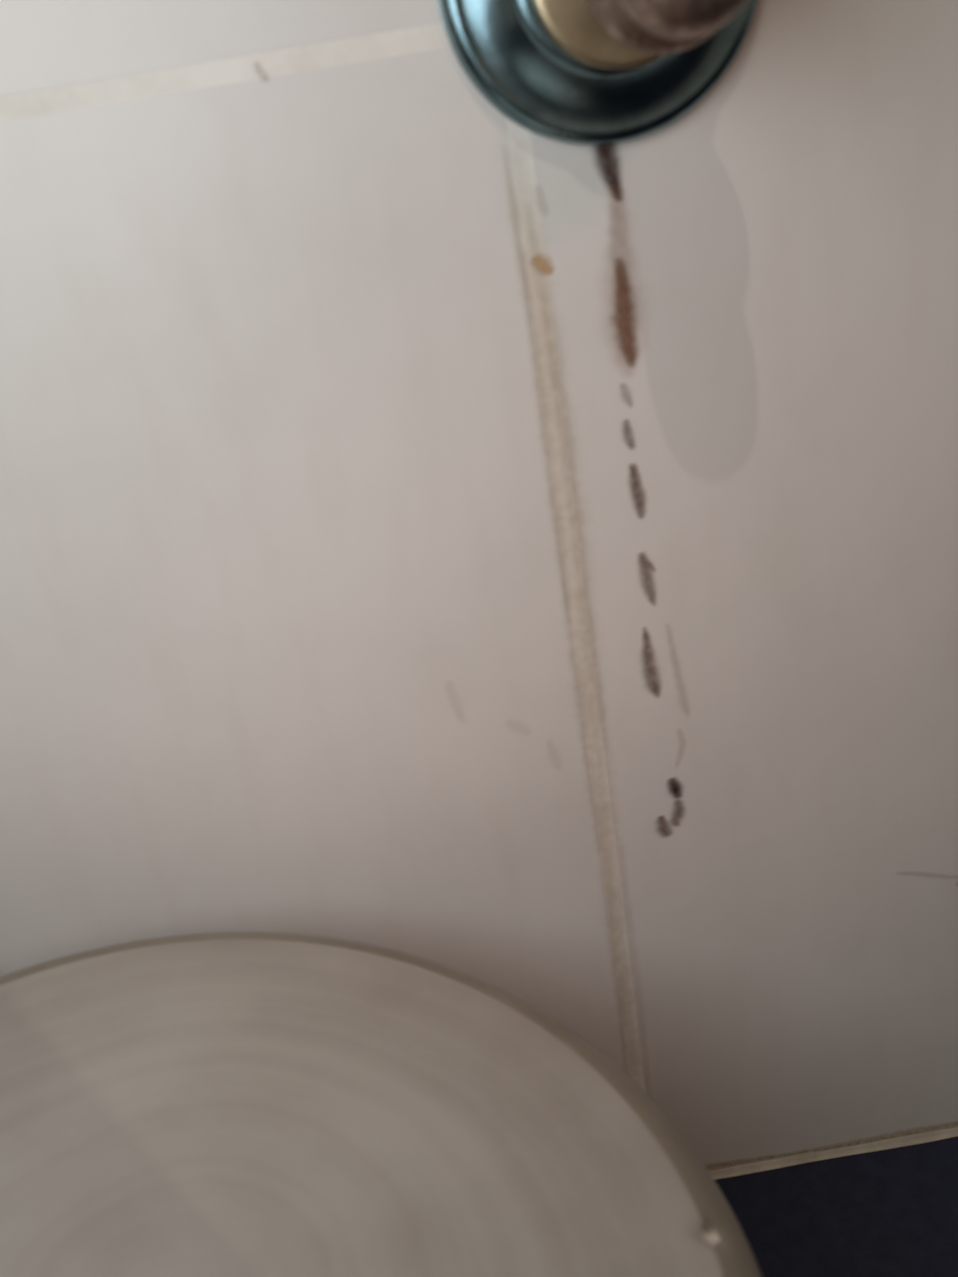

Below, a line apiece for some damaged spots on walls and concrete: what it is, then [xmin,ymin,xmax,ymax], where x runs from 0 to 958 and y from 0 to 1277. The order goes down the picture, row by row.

rust [596,144,621,200]
rust [617,262,635,364]
rust [630,466,643,515]
rust [640,556,653,600]
rust [644,633,659,694]
rust [658,779,682,835]